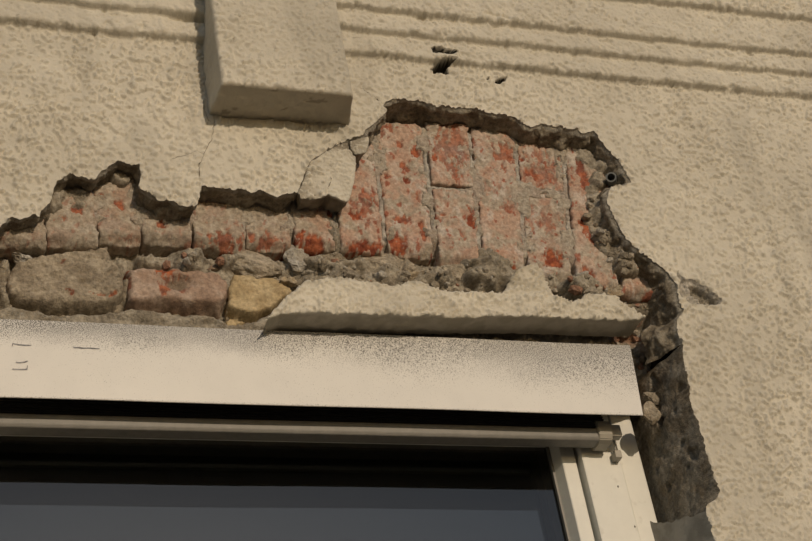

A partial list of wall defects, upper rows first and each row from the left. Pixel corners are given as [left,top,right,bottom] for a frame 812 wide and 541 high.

flaking render [0,98,723,523]